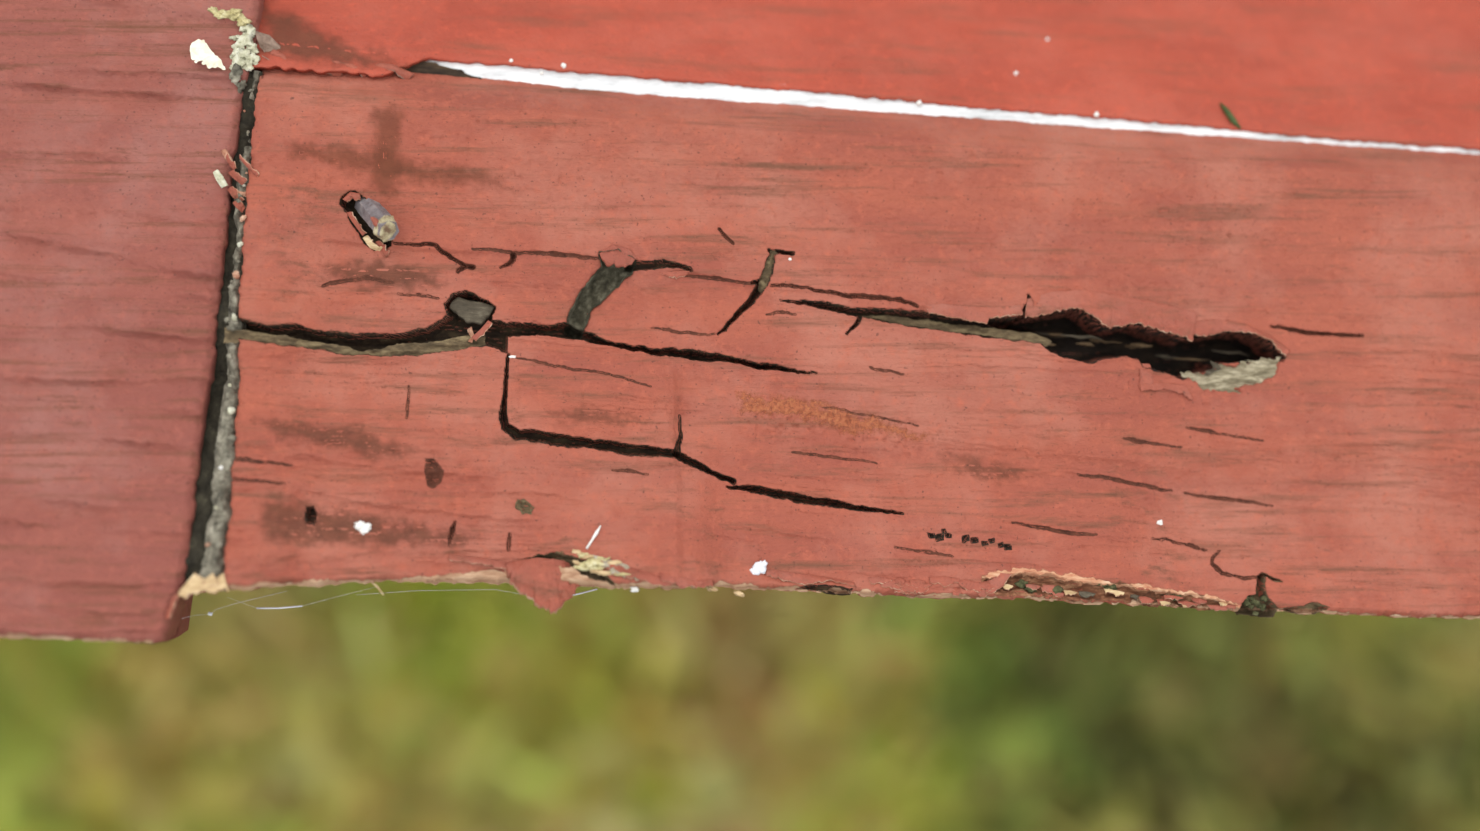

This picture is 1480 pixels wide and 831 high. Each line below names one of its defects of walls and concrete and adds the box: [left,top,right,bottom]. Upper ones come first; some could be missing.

crack [223,227,954,557]
crack [1270,325,1364,337]